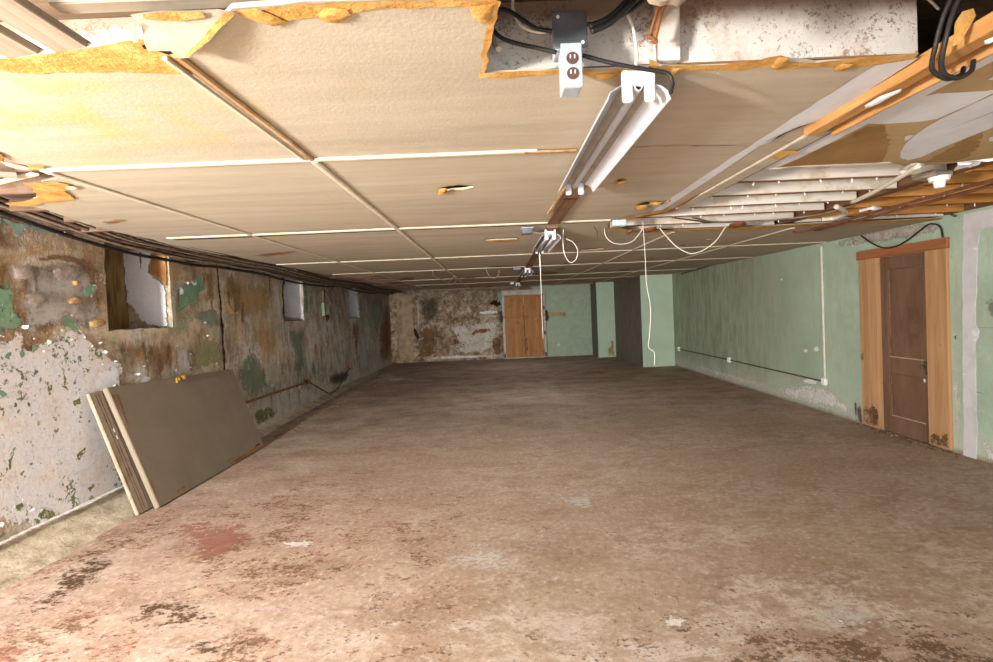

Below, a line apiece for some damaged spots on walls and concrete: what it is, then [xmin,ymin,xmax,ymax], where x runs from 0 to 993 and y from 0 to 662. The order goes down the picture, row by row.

peeling [0,218,65,235]
peeling [0,261,151,527]
water stain [102,341,172,377]
peeling [123,250,238,374]
water stain [205,273,290,357]
flaking render [451,292,502,354]